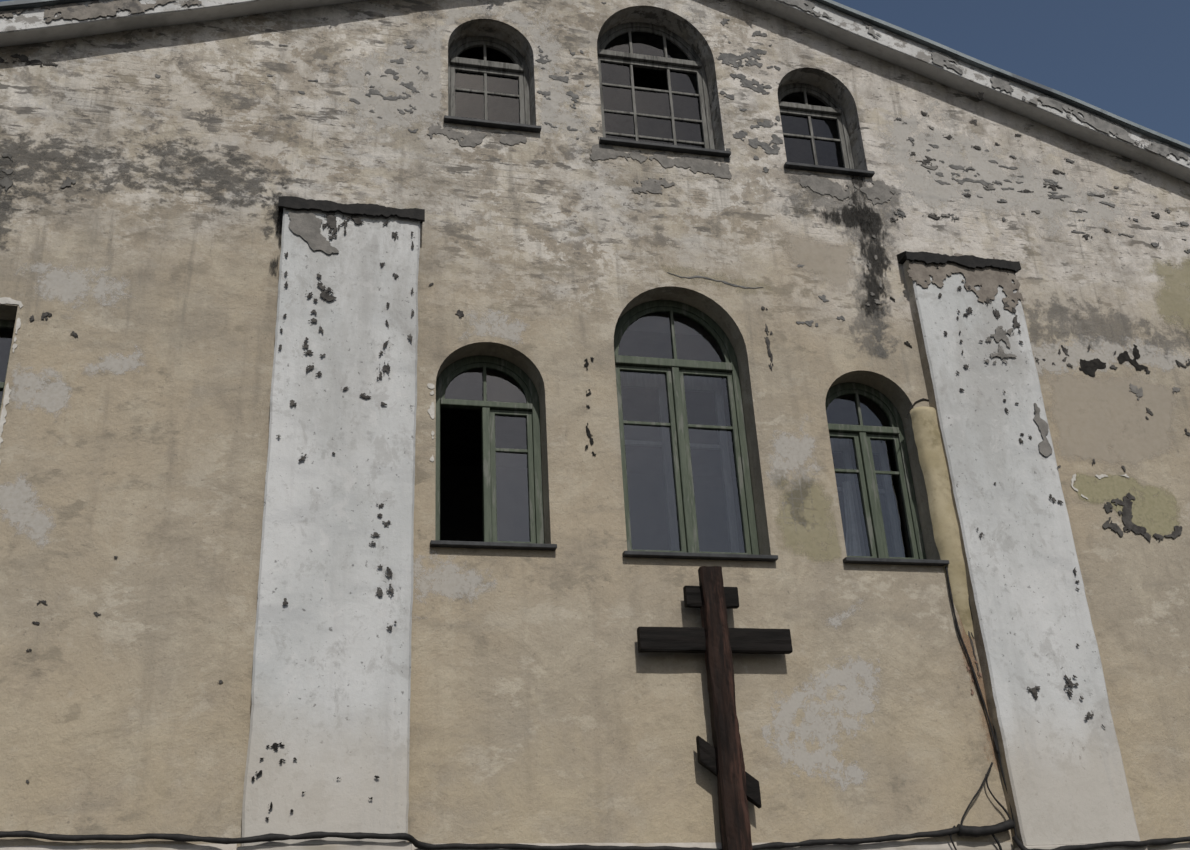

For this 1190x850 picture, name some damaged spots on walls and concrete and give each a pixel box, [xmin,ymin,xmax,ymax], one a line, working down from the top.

flaking render [0,0,202,23]
flaking render [350,41,435,118]
flaking render [716,31,781,111]
water stain [0,130,288,276]
peeling [288,210,364,254]
flaking render [544,115,783,196]
water stain [821,175,891,316]
flaking render [894,111,1138,240]
peeling [907,253,1024,374]
flaking render [1035,344,1153,420]
peeling [1019,403,1052,457]
flaking render [1071,459,1182,542]